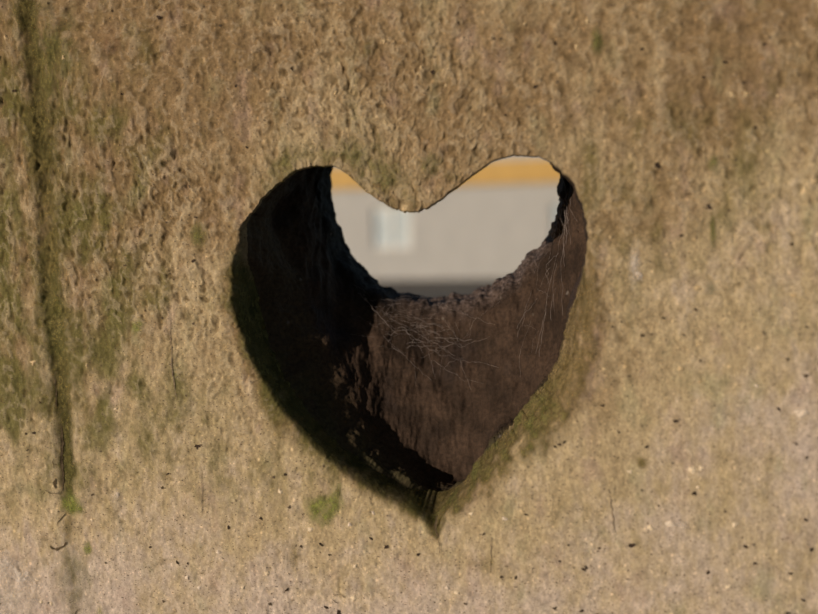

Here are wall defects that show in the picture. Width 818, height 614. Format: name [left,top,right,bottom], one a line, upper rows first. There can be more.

water stain [44,239,76,495]